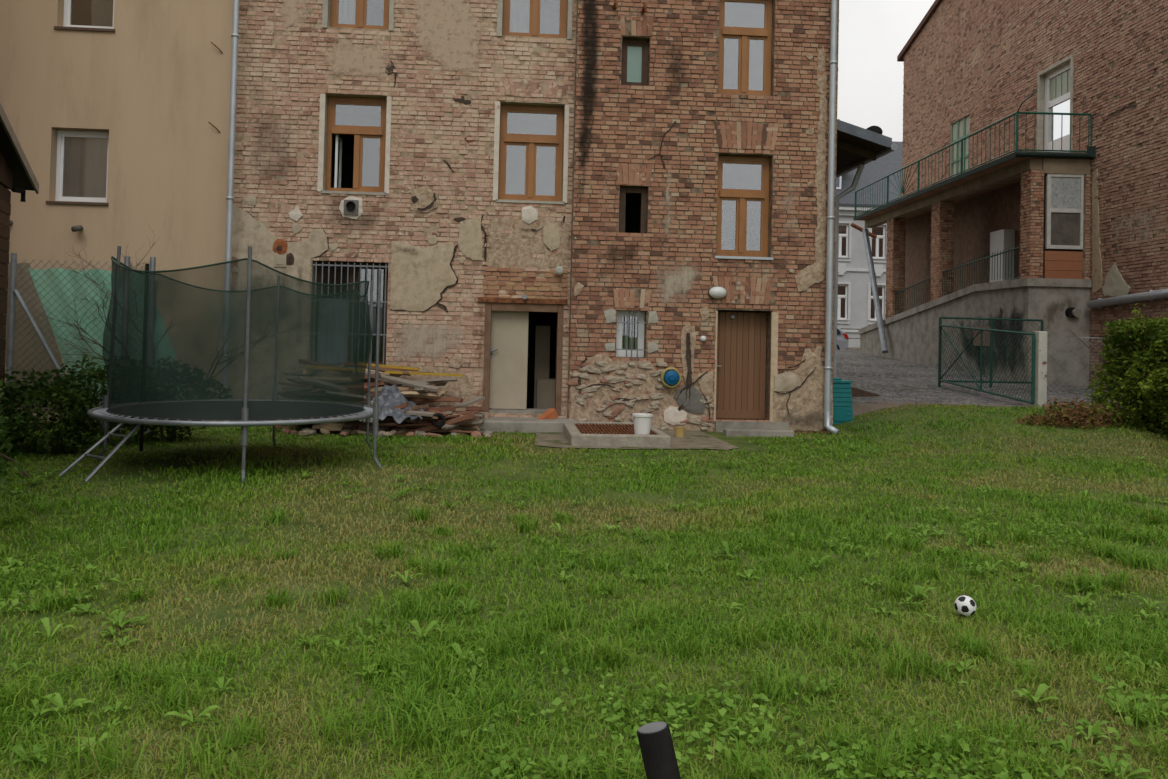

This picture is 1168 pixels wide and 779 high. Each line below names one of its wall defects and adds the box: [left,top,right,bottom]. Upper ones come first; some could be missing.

spalling [411,187,438,213]
peeling [390,216,584,311]
peeling [1092,169,1130,297]
peeling [604,309,616,323]
peeling [648,311,658,323]
spalling [563,342,714,447]
peeling [772,345,833,431]